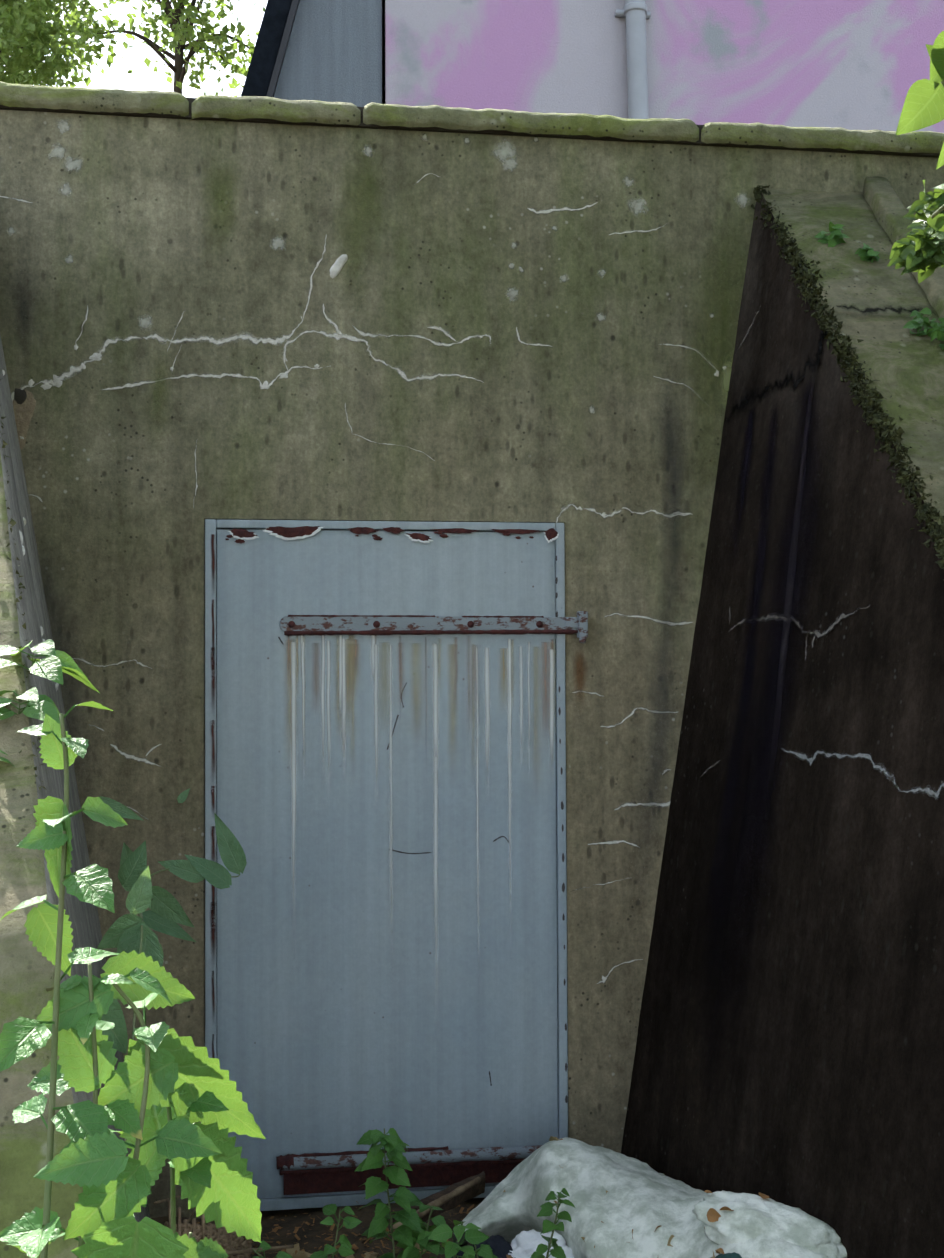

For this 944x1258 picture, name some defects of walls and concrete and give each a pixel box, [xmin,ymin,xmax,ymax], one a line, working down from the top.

crack [11,235,552,403]
crack [345,403,435,461]
crack [556,504,693,523]
crack [605,613,693,626]
crack [729,606,869,651]
crack [601,708,677,728]
crack [781,748,944,798]
corrosion [276,1146,526,1175]